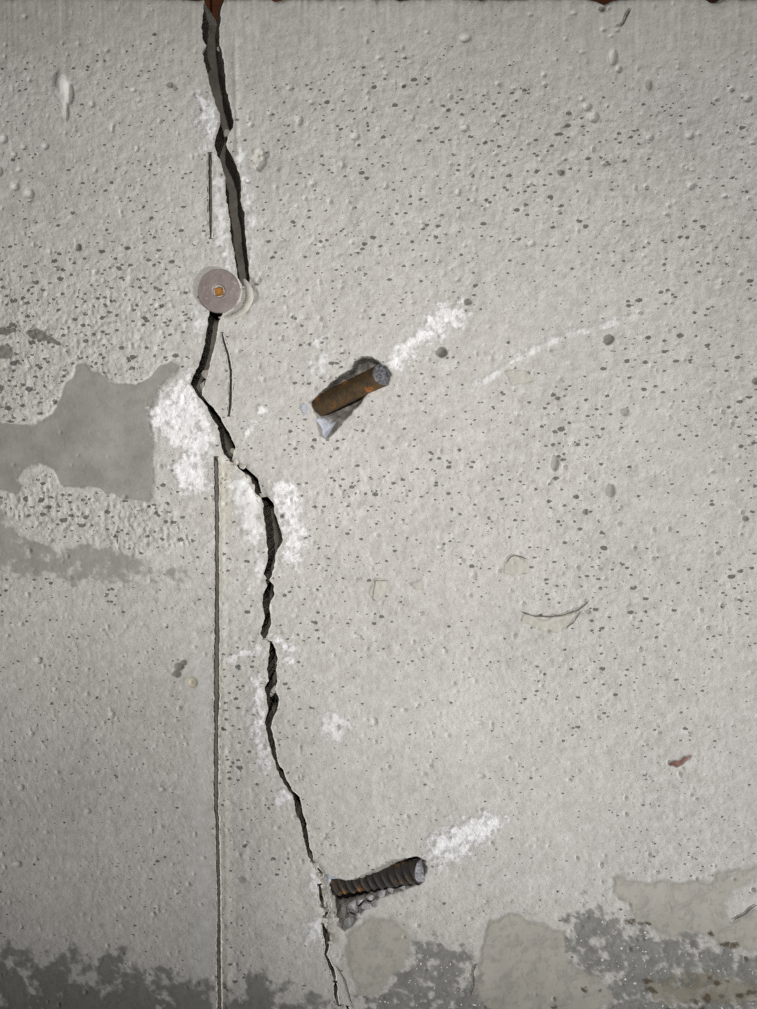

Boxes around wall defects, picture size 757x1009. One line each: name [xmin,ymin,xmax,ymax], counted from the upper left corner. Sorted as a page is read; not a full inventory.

peeling [0,362,177,501]
crack [189,0,353,1009]
damp [0,940,329,1009]
damp [354,942,489,1009]
peeling [476,914,612,1009]
damp [562,895,757,1009]